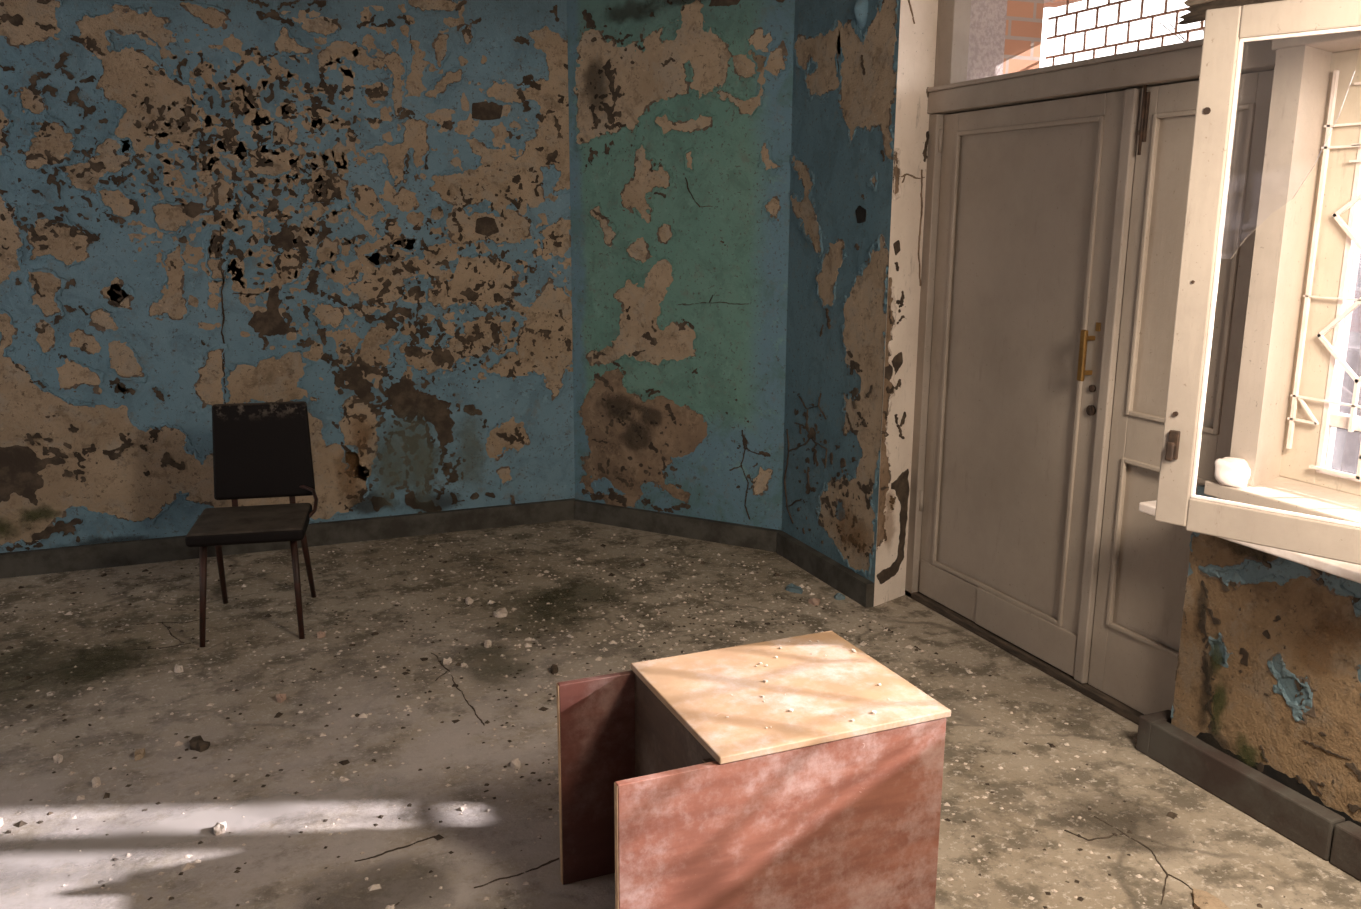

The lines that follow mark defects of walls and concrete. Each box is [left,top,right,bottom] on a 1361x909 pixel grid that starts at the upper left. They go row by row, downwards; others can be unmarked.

peeling [0,0,910,584]
peeling [1171,533,1361,827]